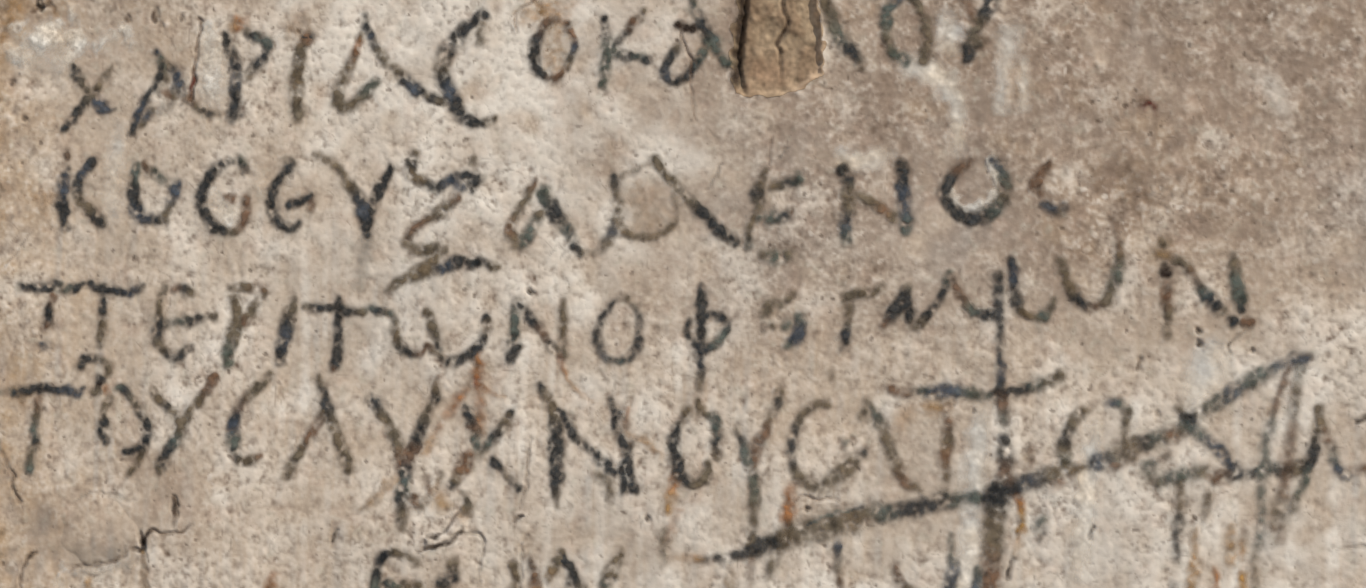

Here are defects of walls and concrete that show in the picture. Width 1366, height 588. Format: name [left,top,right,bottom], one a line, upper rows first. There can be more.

spalling [728,0,827,98]